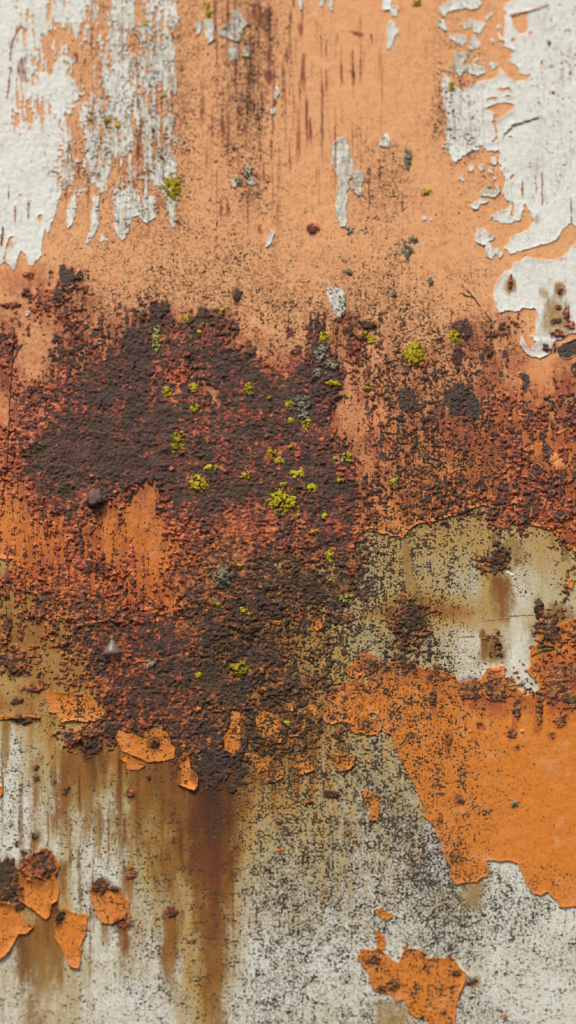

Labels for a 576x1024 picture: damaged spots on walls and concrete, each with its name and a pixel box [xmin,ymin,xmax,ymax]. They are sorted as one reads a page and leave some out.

peeling [0,0,182,271]
corrosion [306,223,320,234]
peeling [331,137,364,227]
peeling [437,0,576,378]
peeling [45,691,105,723]
corrosion [0,266,576,1024]
peeling [351,546,576,695]
peeling [0,715,198,1024]
peeling [213,717,576,1024]